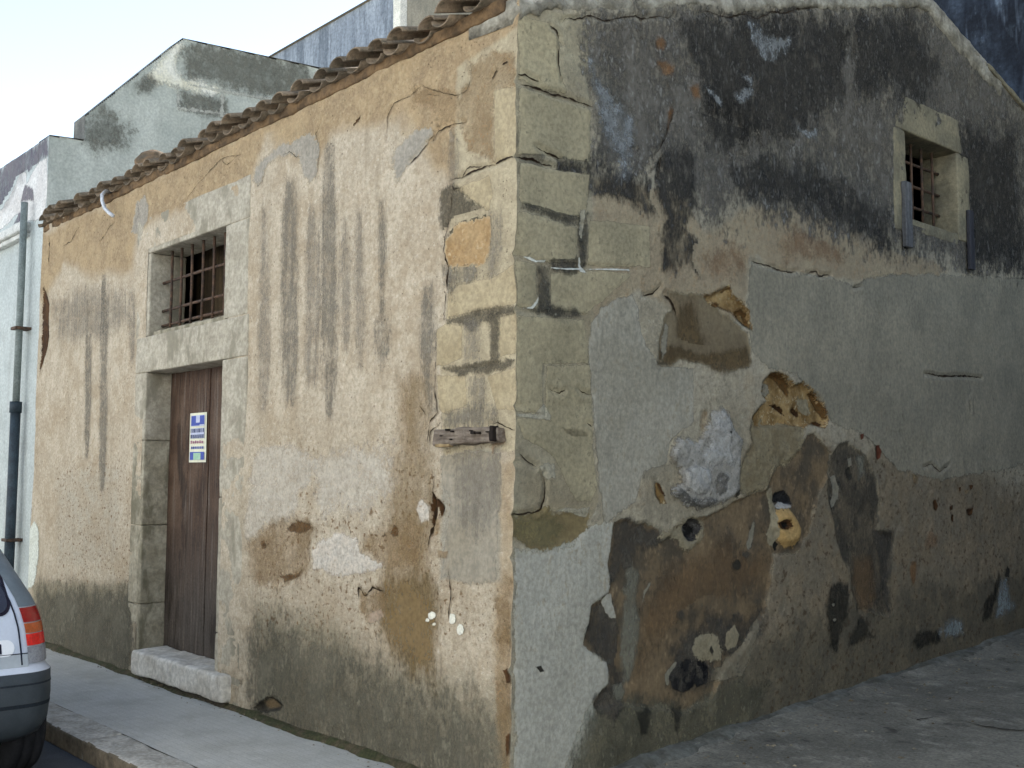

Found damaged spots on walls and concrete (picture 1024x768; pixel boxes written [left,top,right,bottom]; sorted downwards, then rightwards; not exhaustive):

crack [411,122,465,163]
crack [386,15,671,138]
water stain [556,0,1024,286]
water stain [36,582,134,669]
water stain [85,279,108,490]
water stain [280,183,298,404]
peeling [243,438,445,584]
water stain [246,572,506,768]
crack [421,341,440,544]
peeling [643,284,754,372]
spalling [583,371,895,712]
crack [925,371,981,379]